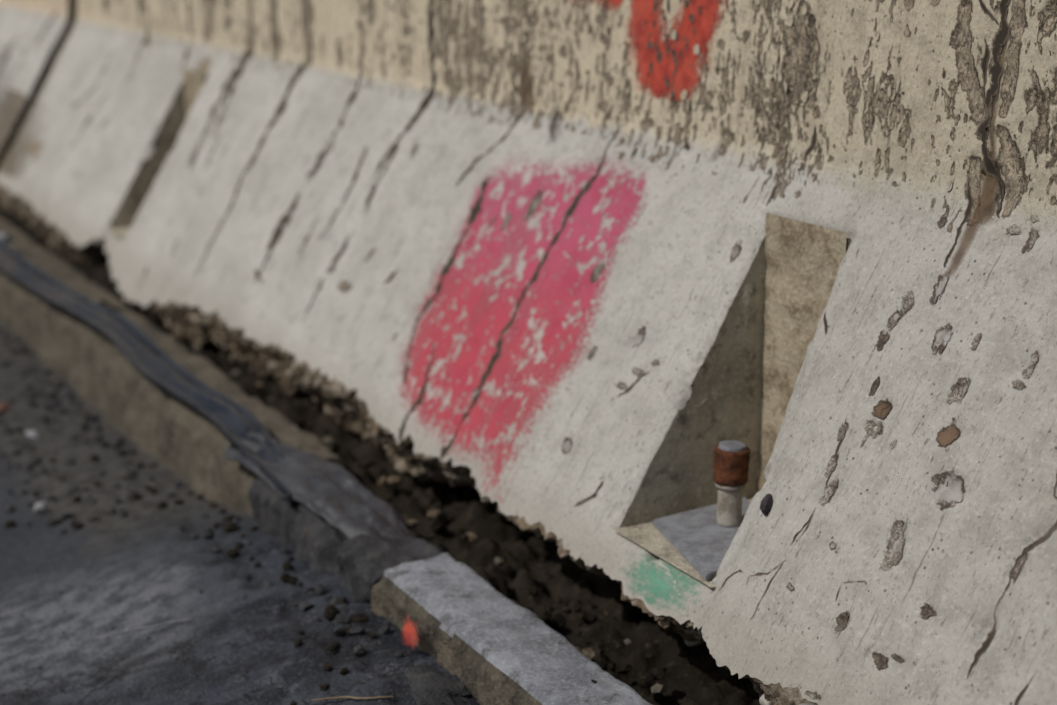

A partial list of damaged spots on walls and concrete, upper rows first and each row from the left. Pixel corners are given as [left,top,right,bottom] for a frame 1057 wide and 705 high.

peeling [164,0,915,205]
crack [944,0,1011,267]
spalling [928,0,1057,253]
crack [393,111,521,442]
crack [440,108,614,459]
crack [611,371,650,400]
hole [860,376,896,449]
hole [872,652,904,670]
hole [936,417,960,447]
hole [931,470,965,510]
crack [966,473,1057,679]
crack [1014,678,1032,705]